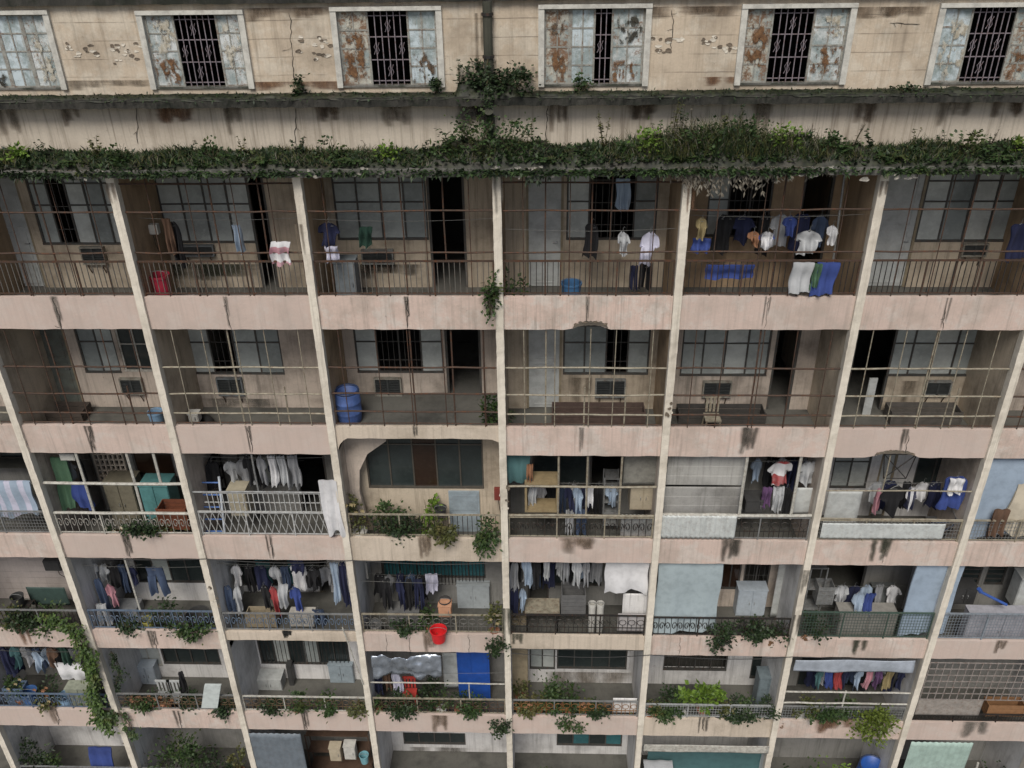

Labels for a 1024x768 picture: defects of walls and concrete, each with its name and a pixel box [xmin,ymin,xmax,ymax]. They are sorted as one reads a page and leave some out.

peeling [65,20,176,64]
corrosion [156,58,181,84]
spalling [295,35,333,61]
corrosion [413,53,435,83]
spalling [651,36,685,53]
spalling [701,35,737,53]
corrosion [746,23,768,72]
corrosion [813,47,839,74]
damp [741,427,758,450]
damp [565,538,592,550]
damp [722,539,740,560]
damp [871,539,892,560]